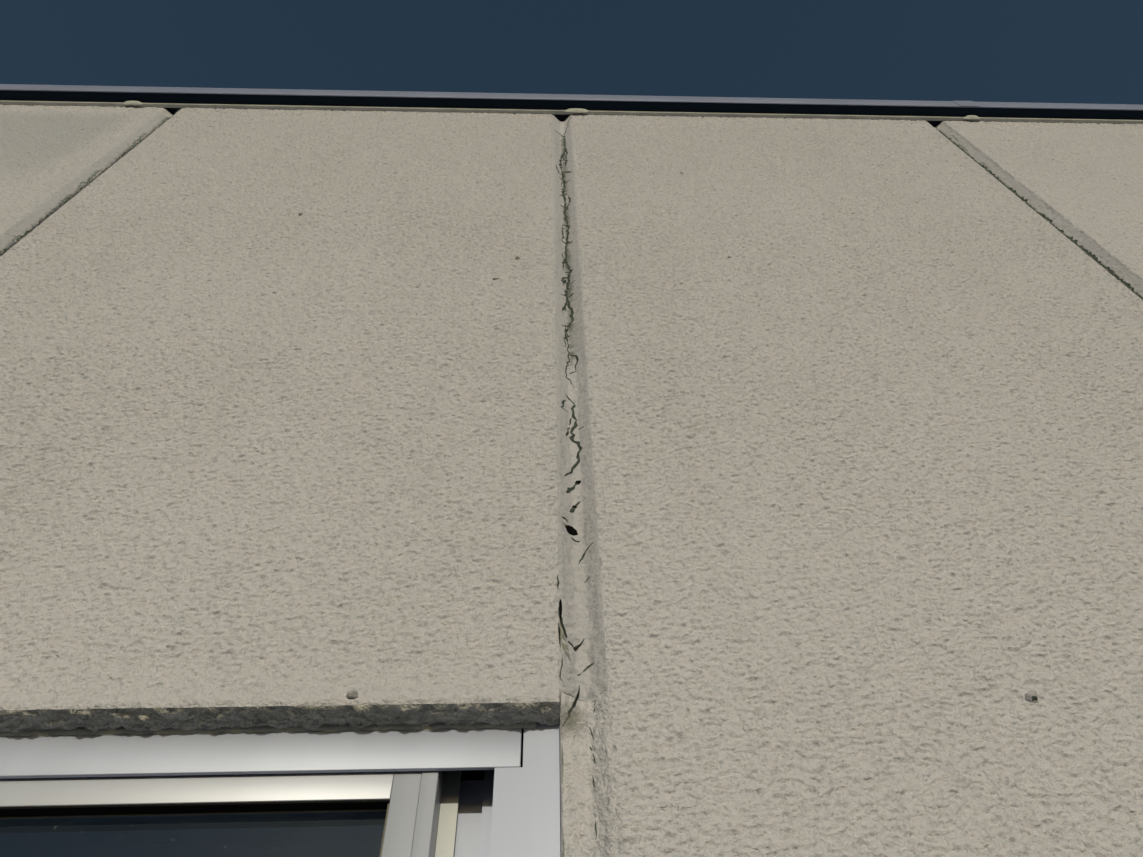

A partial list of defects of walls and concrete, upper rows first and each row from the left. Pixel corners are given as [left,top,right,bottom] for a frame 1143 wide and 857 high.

crack [556,118,596,788]